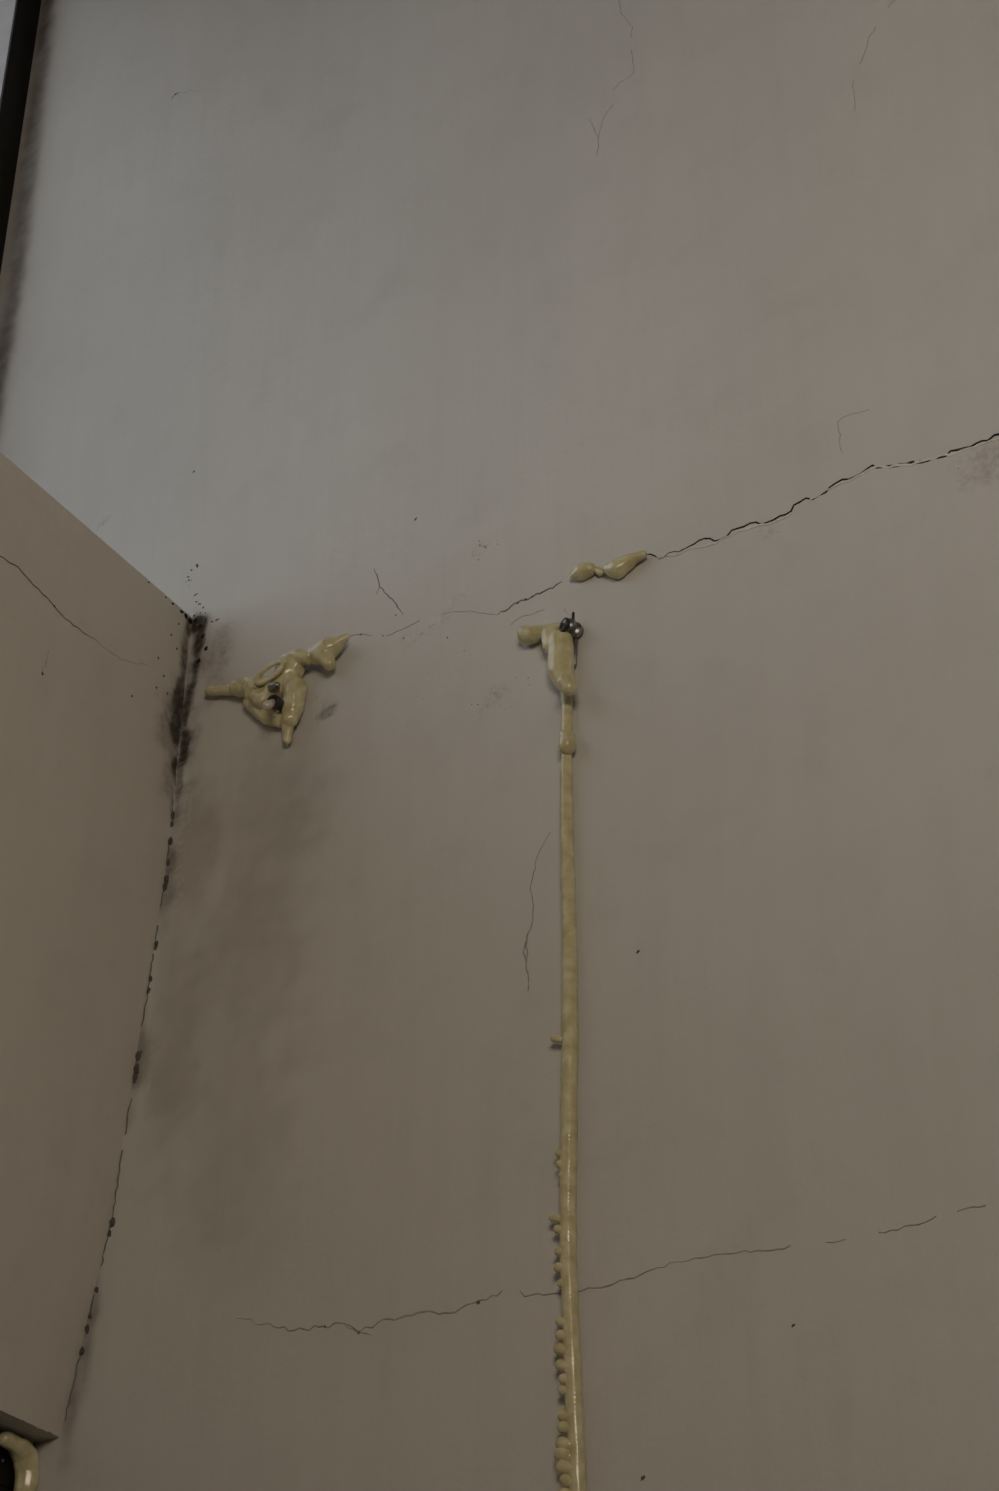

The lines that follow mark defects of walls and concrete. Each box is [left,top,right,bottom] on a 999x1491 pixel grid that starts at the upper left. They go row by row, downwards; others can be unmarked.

crack [647,409,999,561]
crack [351,569,571,639]
crack [238,1205,986,1336]